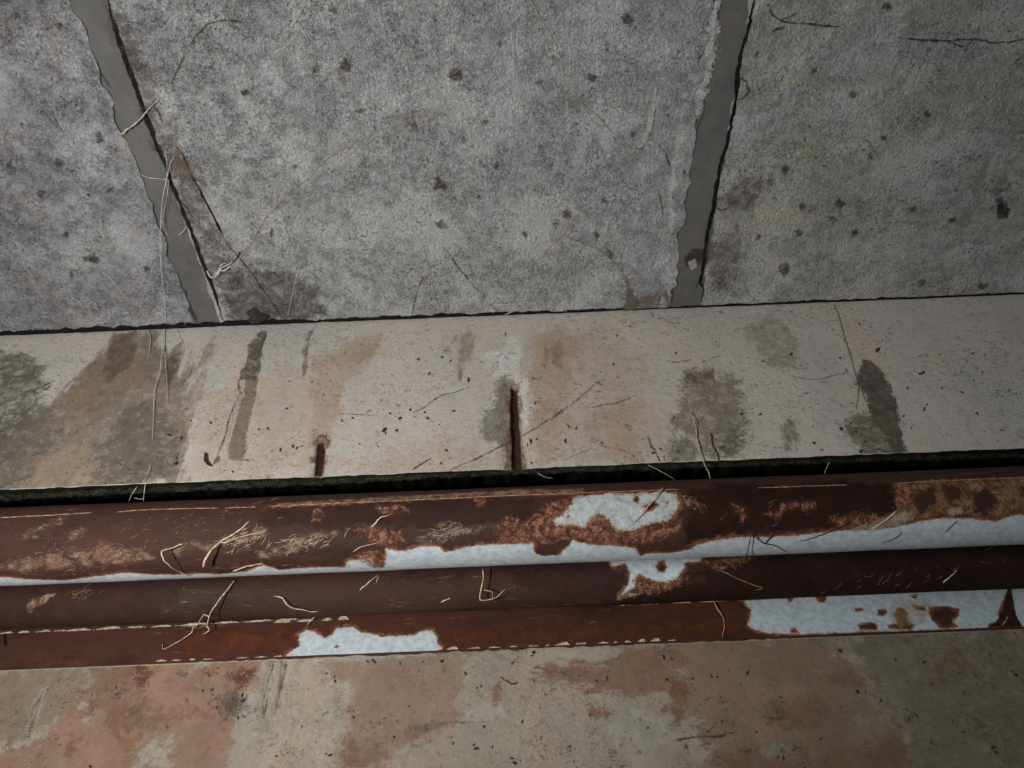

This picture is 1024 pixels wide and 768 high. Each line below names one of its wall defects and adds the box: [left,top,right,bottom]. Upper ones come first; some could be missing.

crack [0,0,1024,358]
crack [217,380,243,457]
damp [0,331,1024,510]
damp [2,545,153,572]
peeling [0,477,1024,606]
corrosion [260,480,919,569]
corrosion [513,544,1024,627]
peeling [738,589,1024,637]
damp [200,688,264,755]
damp [815,630,1024,768]